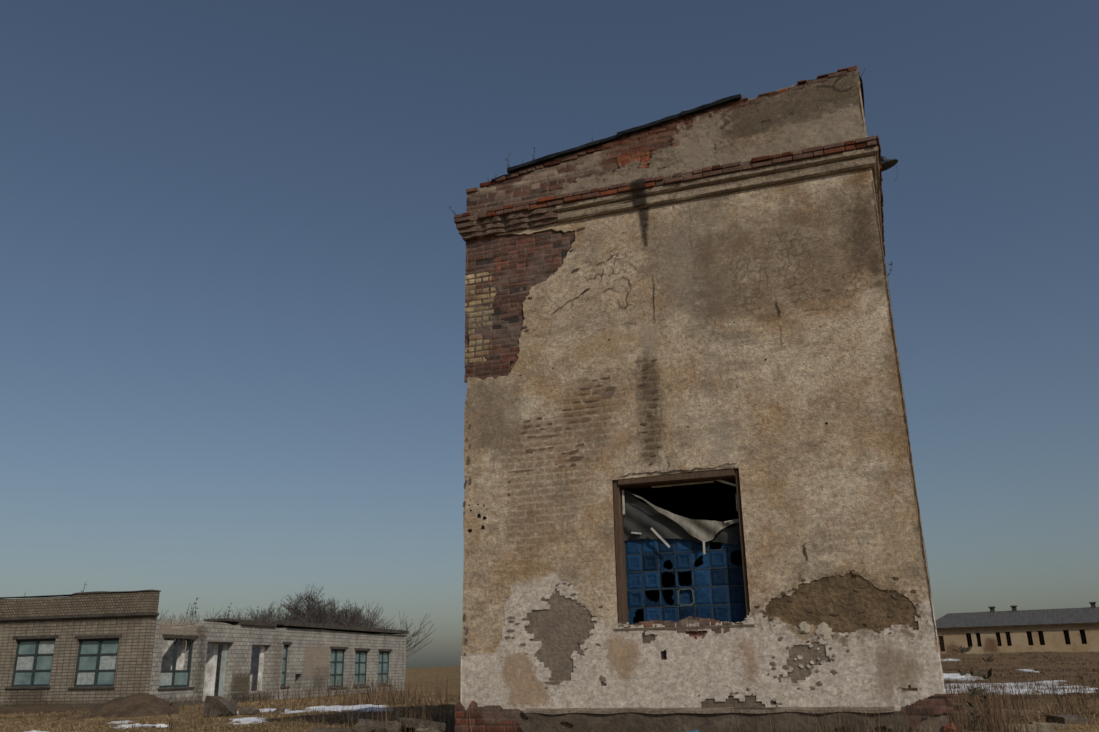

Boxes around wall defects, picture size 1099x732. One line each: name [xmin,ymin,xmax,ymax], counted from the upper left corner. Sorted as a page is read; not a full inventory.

flaking render [466,65,858,213]
damp [602,68,861,169]
damp [631,178,648,246]
spalling [464,227,585,383]
crack [552,249,664,330]
spalling [463,421,472,514]
peeling [455,569,963,732]